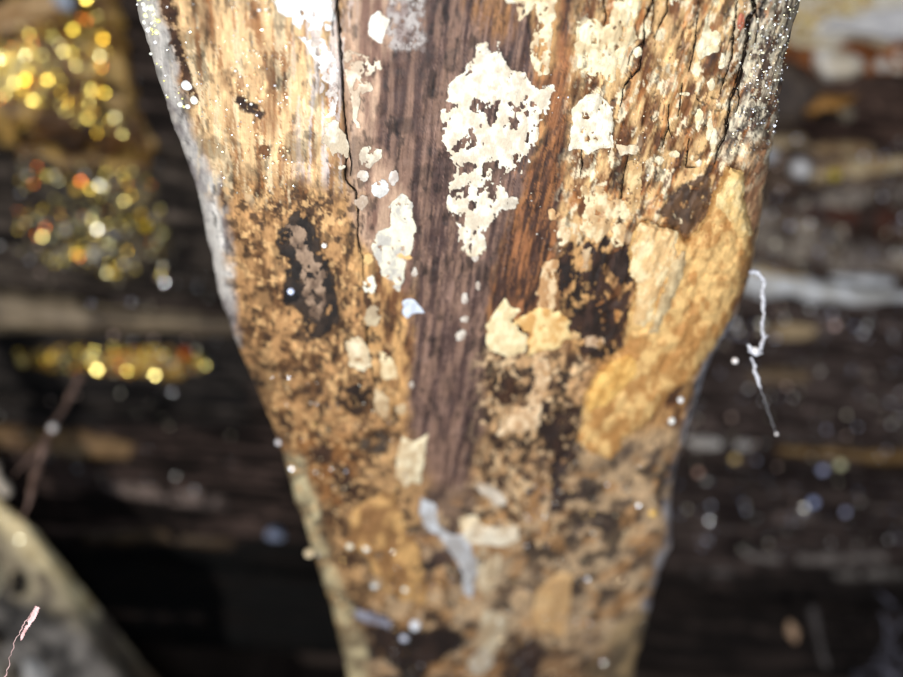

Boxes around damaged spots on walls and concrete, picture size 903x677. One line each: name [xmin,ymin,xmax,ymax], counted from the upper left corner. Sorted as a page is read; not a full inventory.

peeling [275,0,382,170]
crack [331,0,364,281]
peeling [368,0,426,52]
peeling [463,243,486,257]
peeling [494,197,519,210]
peeling [486,259,605,436]
crack [617,156,629,227]
crack [620,0,668,107]
peeling [568,93,754,459]
crack [662,0,759,168]